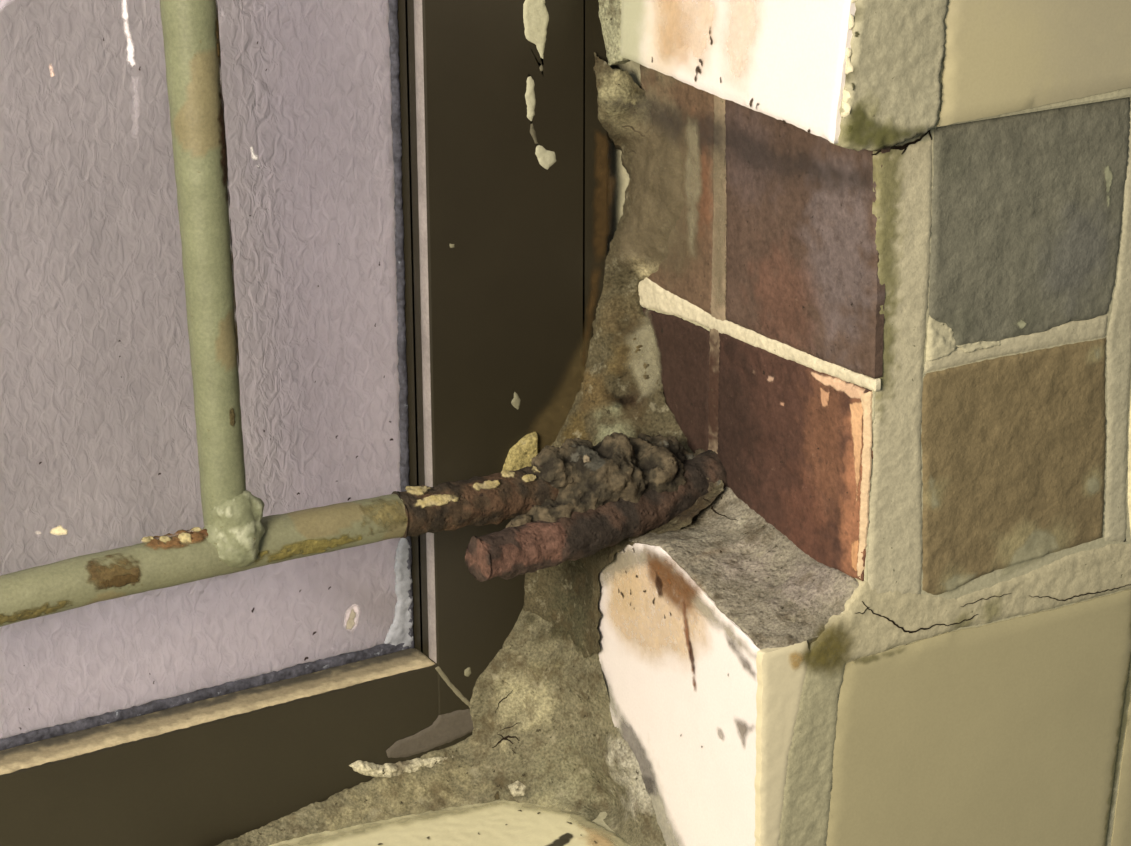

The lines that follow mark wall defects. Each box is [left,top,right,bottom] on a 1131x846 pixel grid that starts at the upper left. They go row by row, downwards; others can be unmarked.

corrosion [506,272,716,528]
peeling [473,466,540,491]
crack [855,584,1129,633]